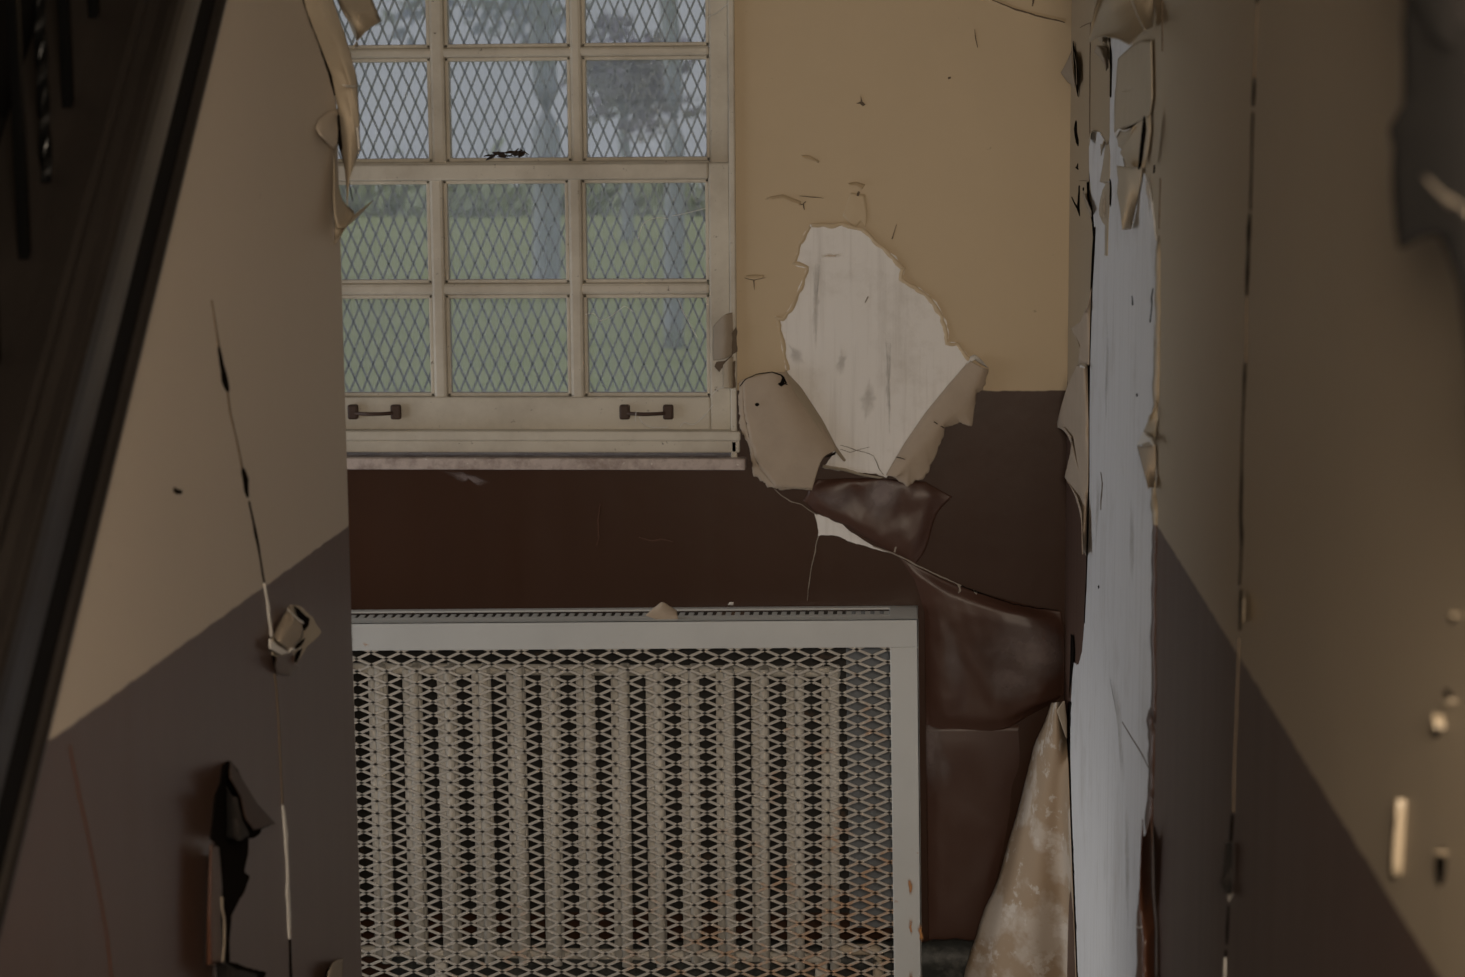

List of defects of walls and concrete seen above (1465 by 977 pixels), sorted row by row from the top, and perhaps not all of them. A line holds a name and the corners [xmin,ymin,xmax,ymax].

peeling [303,0,381,245]
crack [974,0,1091,137]
crack [1071,174,1095,254]
crack [211,300,273,636]
peeling [713,223,989,491]
peeling [964,0,1161,977]
crack [1220,0,1259,977]
crack [274,674,292,977]
peeling [269,605,321,676]
peeling [1392,798,1406,876]
peeling [1432,700,1457,729]